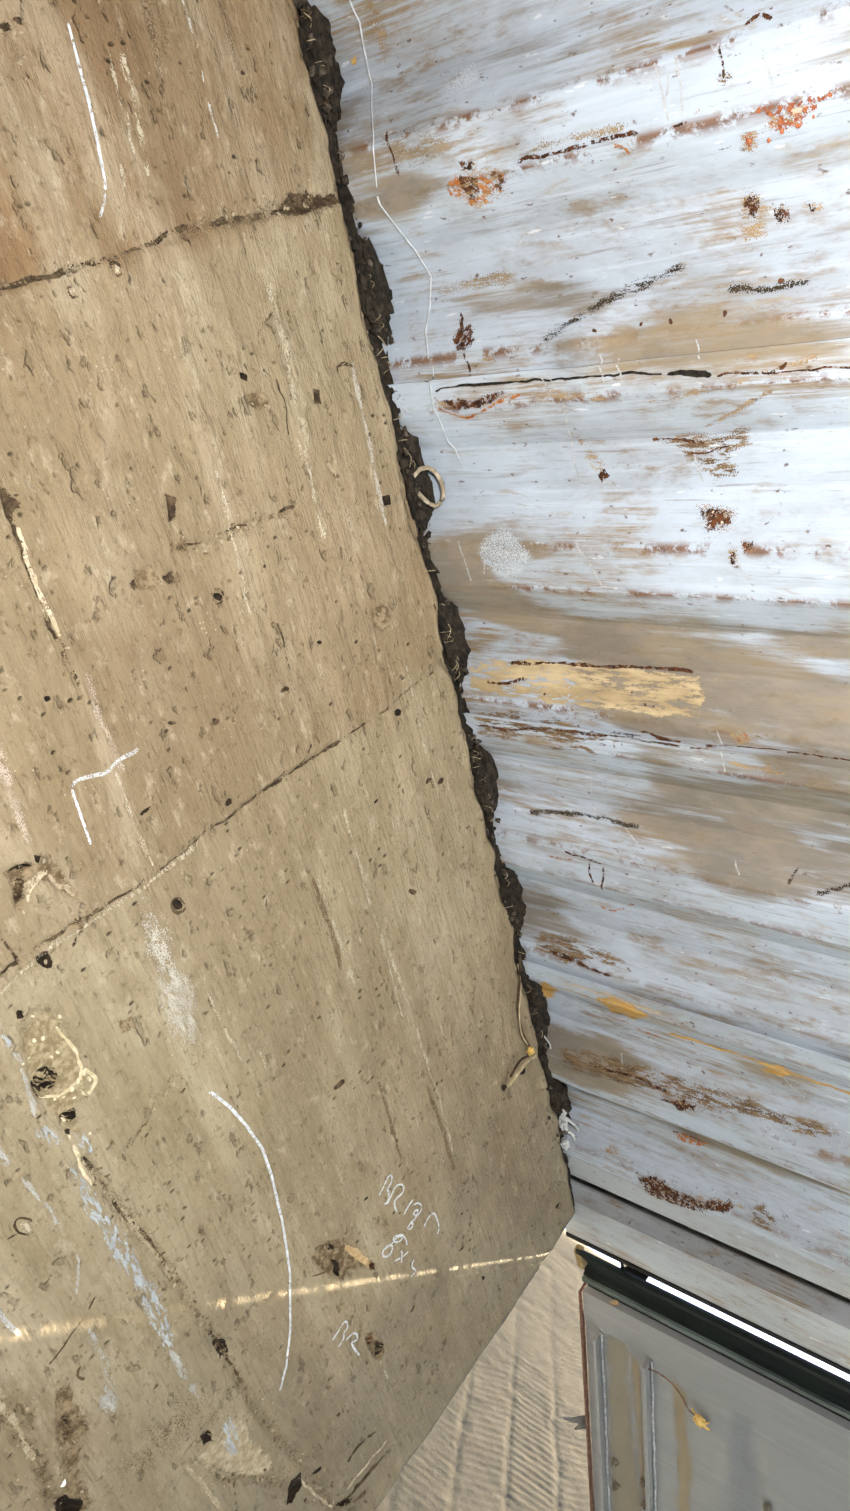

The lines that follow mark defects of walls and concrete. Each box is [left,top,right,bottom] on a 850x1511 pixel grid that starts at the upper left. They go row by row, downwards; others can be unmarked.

corrosion [442,130,638,211]
corrosion [739,87,837,152]
crack [0,179,357,296]
corrosion [649,353,818,484]
crack [0,487,81,689]
corrosion [696,503,755,565]
crack [0,664,460,996]
corrosion [539,981,850,1095]
crack [558,1128,575,1208]
corrosion [637,1173,776,1232]
crack [66,1143,460,1511]
crack [0,1387,63,1511]